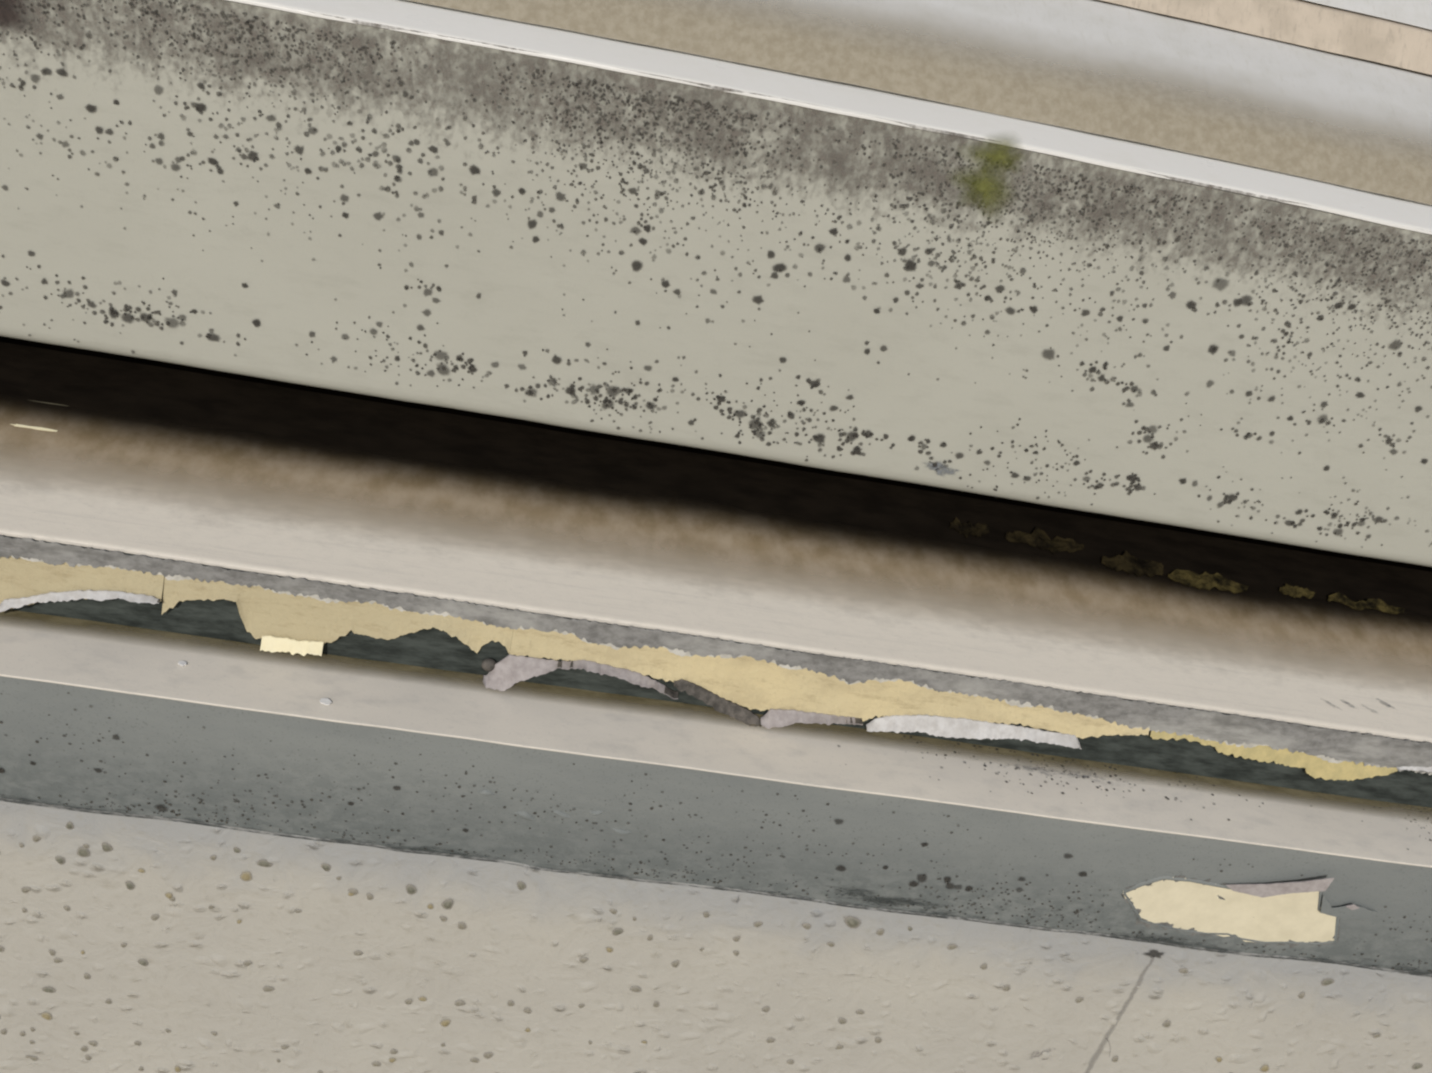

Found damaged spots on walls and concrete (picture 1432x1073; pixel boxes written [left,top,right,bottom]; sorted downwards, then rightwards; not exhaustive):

damp [0,0,1432,459]
damp [505,343,1156,505]
damp [1179,466,1399,548]
peeling [0,535,1432,808]
crack [1146,950,1163,958]
peeling [1121,875,1377,948]